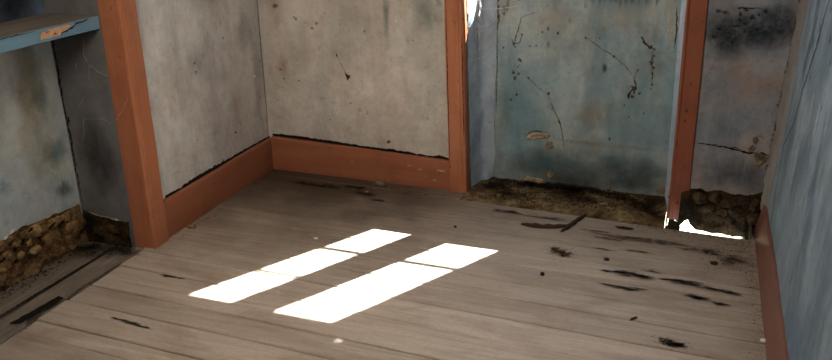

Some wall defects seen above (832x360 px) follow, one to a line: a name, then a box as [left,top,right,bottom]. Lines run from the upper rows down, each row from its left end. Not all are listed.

peeling [40,24,72,40]
crack [496,0,564,147]
crack [585,10,678,99]
water stain [709,9,792,51]
crack [697,0,829,220]
flaking render [0,204,132,292]
flaking render [655,187,762,241]